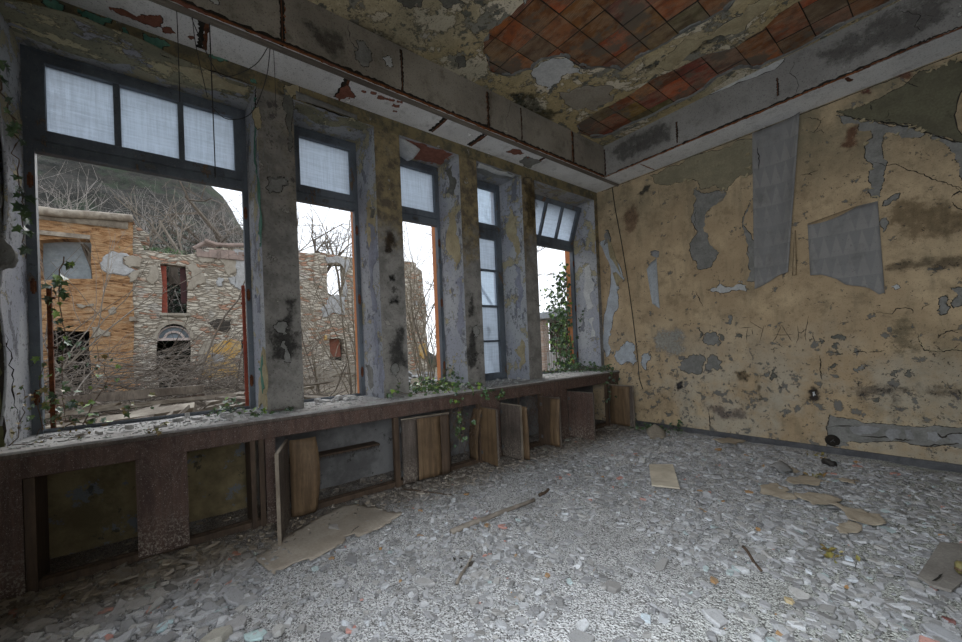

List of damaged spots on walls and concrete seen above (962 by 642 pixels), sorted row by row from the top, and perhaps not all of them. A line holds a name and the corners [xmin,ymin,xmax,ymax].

flaking render [0,107,19,288]
peeling [0,0,262,247]
flaking render [483,0,735,90]
flaking render [571,0,894,162]
flaking render [836,55,962,232]
crack [0,331,18,440]